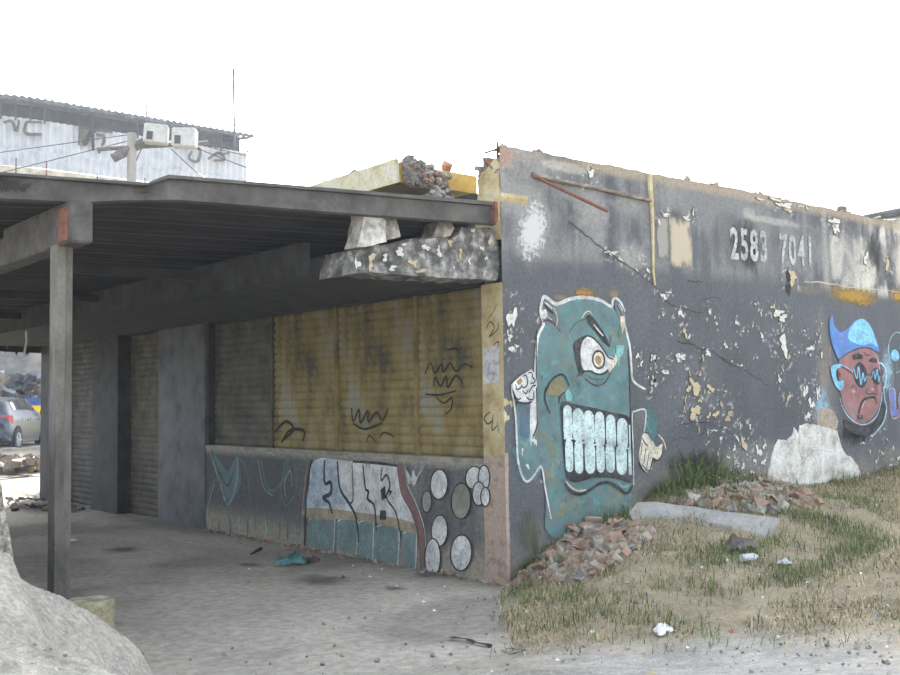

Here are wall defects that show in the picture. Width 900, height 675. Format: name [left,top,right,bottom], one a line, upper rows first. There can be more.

spalling [389,154,453,198]
peeling [354,243,427,273]
peeling [420,239,471,269]
peeling [656,207,694,268]
spalling [786,268,798,289]
crack [569,222,767,385]
peeling [734,303,823,384]
peeling [635,352,669,394]
spalling [672,348,869,486]